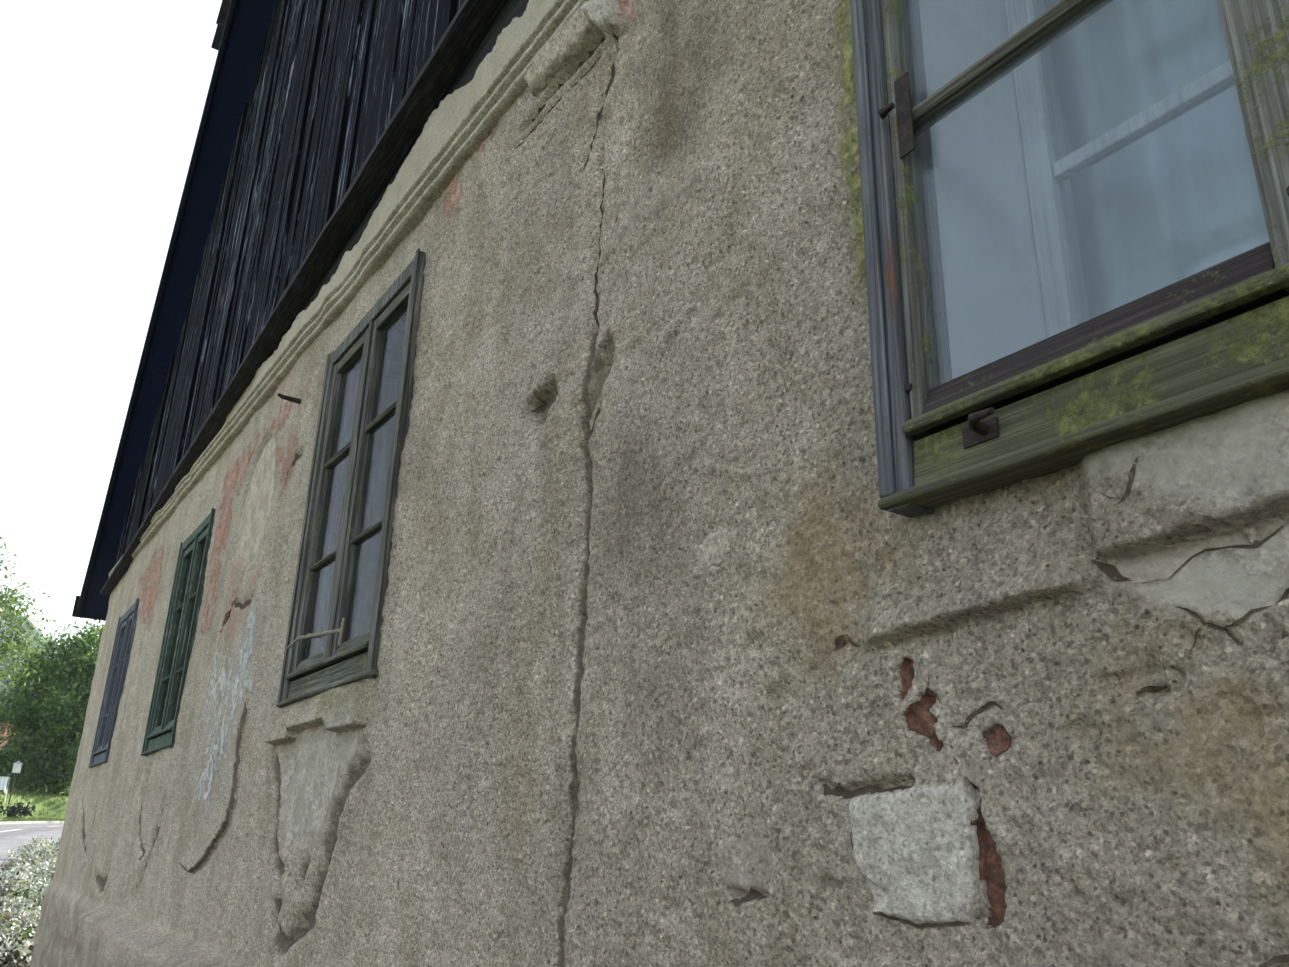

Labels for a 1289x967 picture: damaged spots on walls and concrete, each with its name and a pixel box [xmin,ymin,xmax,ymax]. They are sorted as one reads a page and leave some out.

flaking render [517,0,621,147]
flaking render [531,382,558,421]
crack [558,33,619,967]
crack [1100,457,1137,506]
crack [1177,606,1270,652]
flaking render [899,658,947,751]
flaking render [982,724,1012,757]